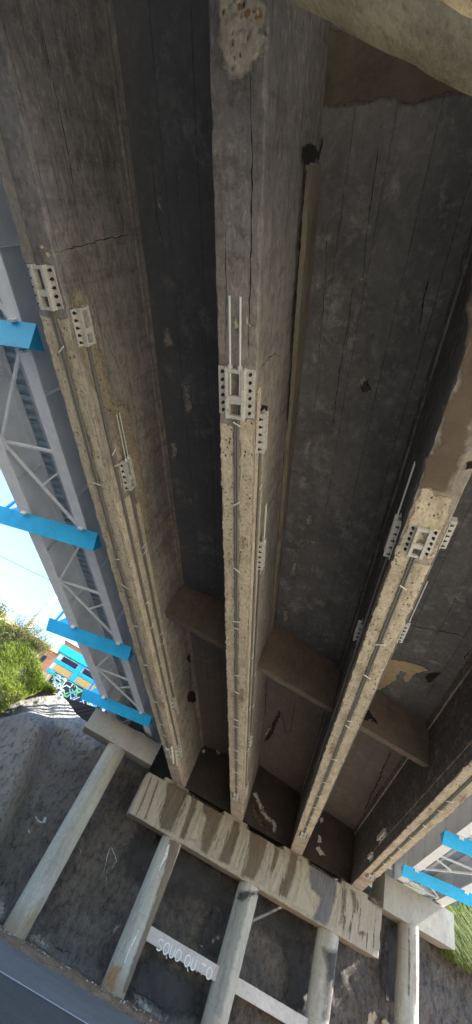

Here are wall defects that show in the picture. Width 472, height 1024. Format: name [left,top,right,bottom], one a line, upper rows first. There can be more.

crack [40,20,125,372]
spalling [218,0,268,80]
crack [225,125,307,426]
spalling [302,143,318,165]
spalling [296,305,472,834]
leakage [123,777,417,1022]